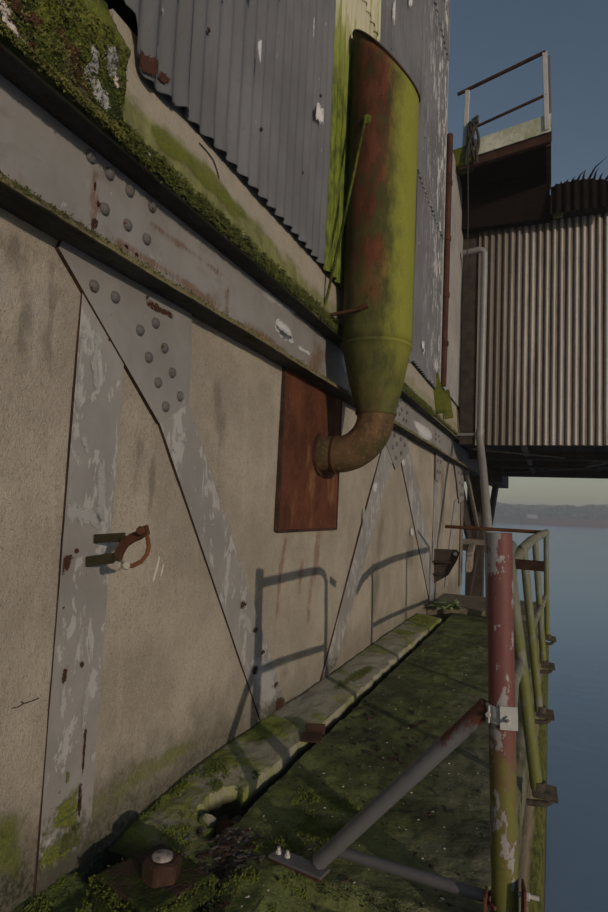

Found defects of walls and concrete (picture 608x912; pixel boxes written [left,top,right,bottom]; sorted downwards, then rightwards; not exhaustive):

peeling [0,0,26,43]
peeling [57,27,119,110]
corrosion [139,49,170,83]
corrosion [146,295,173,318]
peeling [250,657,276,703]